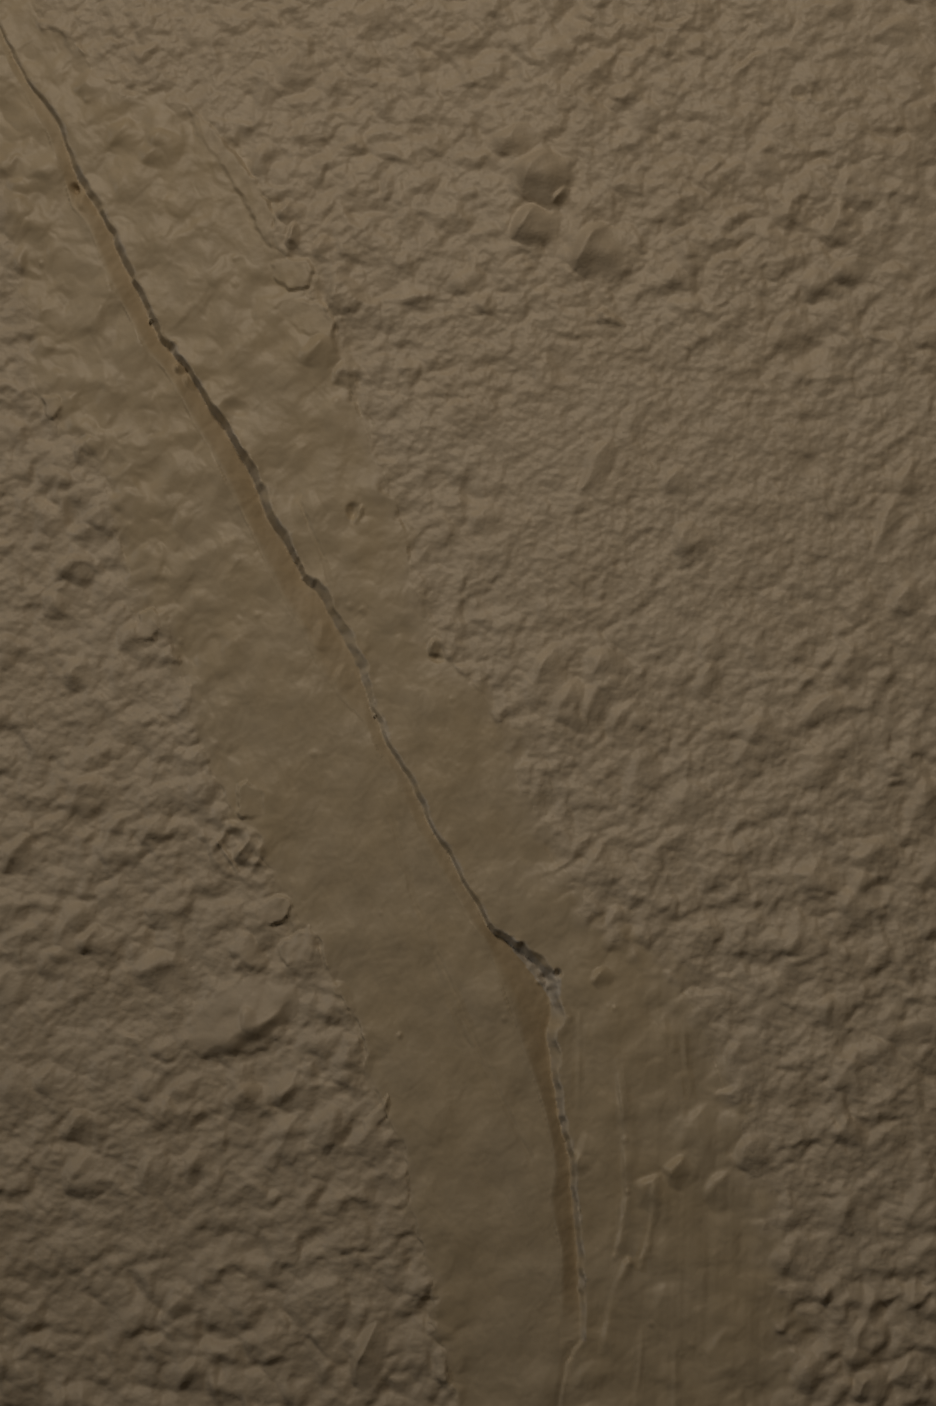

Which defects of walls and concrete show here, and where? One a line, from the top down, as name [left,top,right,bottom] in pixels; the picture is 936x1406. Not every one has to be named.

crack [0,18,588,1406]